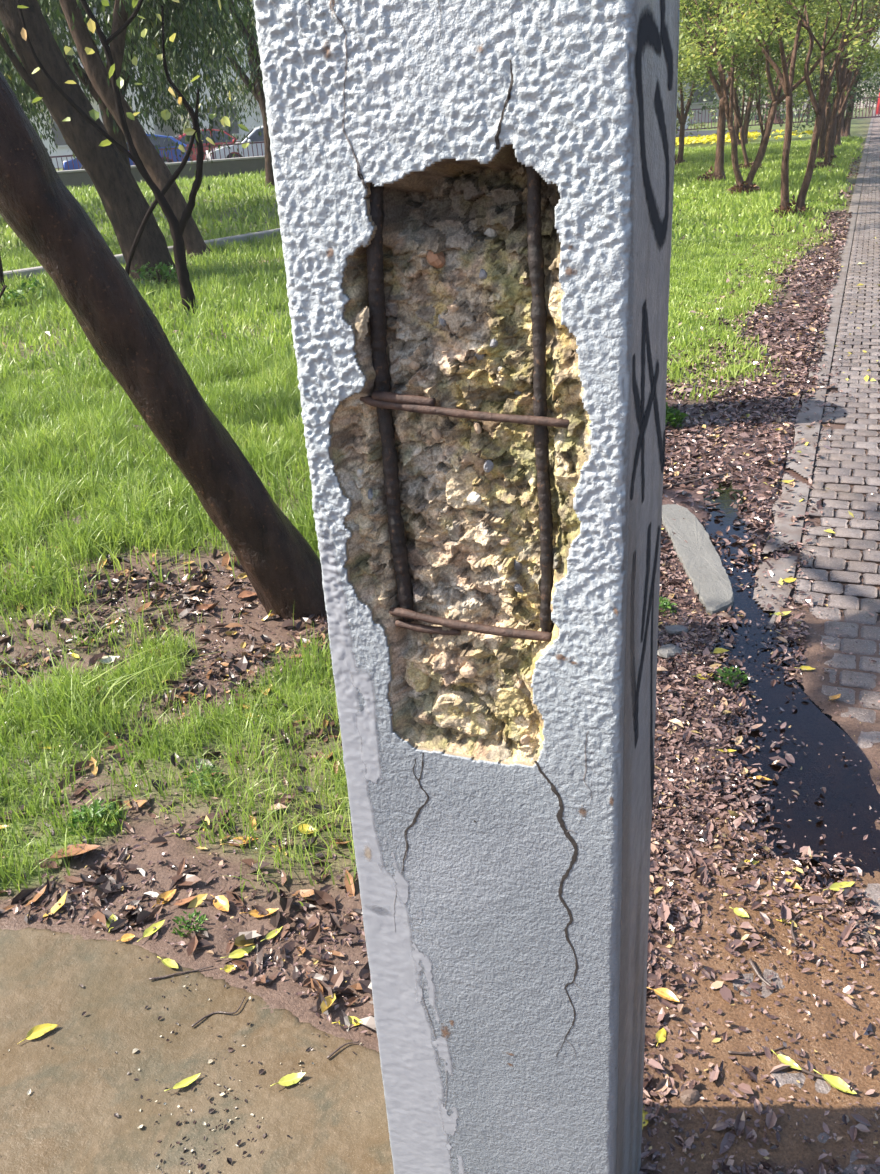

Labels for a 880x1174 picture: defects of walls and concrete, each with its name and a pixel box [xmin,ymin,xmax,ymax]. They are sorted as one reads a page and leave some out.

crack [309,0,369,190]
crack [495,60,513,150]
spalling [319,144,591,1174]
crack [394,753,429,932]
crack [534,731,592,1058]